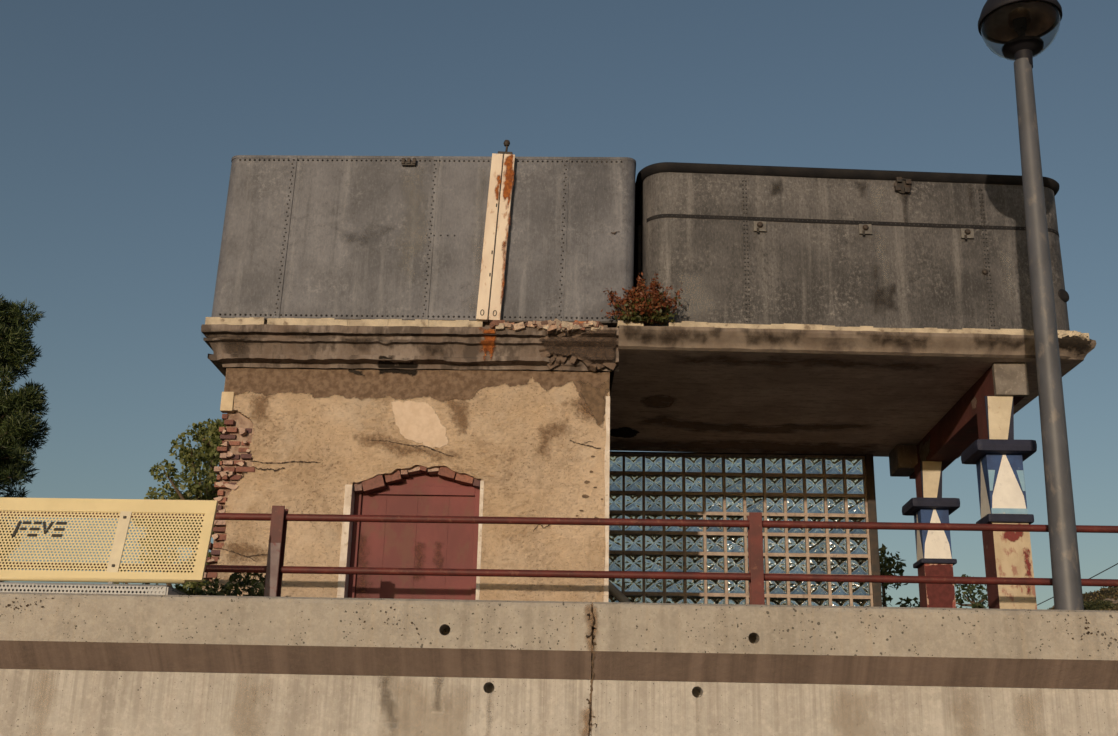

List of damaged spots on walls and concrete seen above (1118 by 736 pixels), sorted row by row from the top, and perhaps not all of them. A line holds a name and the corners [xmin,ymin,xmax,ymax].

rust [495,154,514,298]
rust [480,327,495,360]
leakage [746,330,801,343]
leakage [873,334,925,345]
spalling [1057,330,1092,352]
leakage [210,325,721,433]
leakage [610,440,873,454]
flaking render [203,412,255,585]
peeling [1023,549,1031,594]
crack [586,602,597,736]